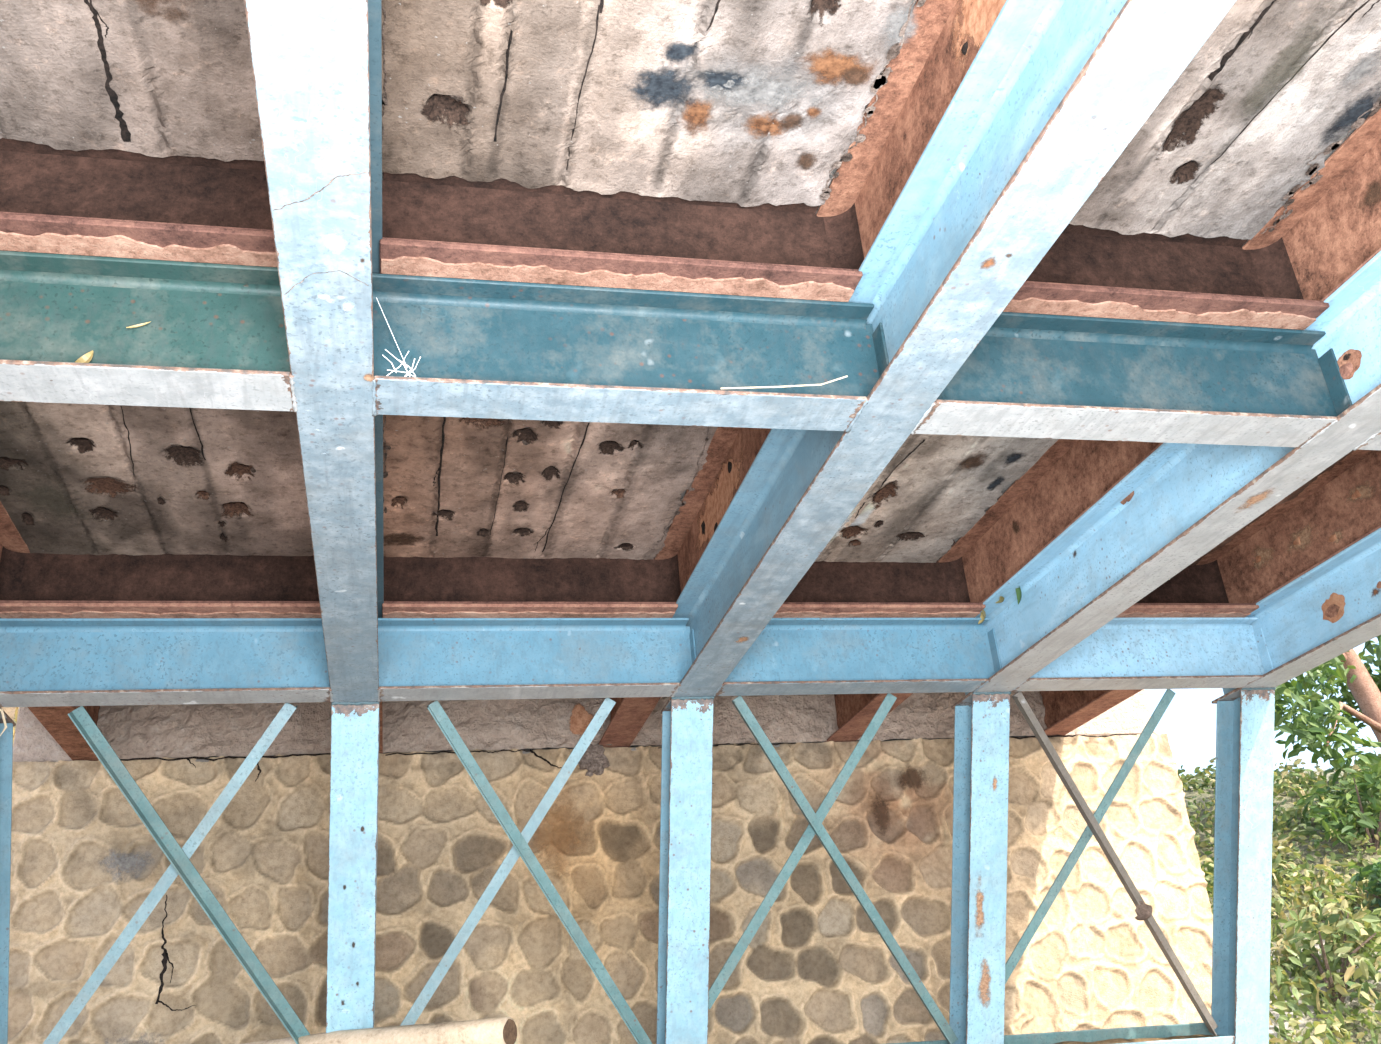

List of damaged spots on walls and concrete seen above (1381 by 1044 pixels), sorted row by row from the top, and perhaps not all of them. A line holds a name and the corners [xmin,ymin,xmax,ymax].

spalling [809,0,841,27]
crack [84,0,131,142]
spalling [421,94,470,129]
crack [566,0,604,170]
leakage [632,43,745,109]
rust [748,107,820,136]
rust [809,49,873,84]
spalling [1156,84,1226,184]
crack [1205,0,1380,170]
spalling [163,444,203,467]
rust [1321,592,1346,623]
crack [155,895,195,1011]